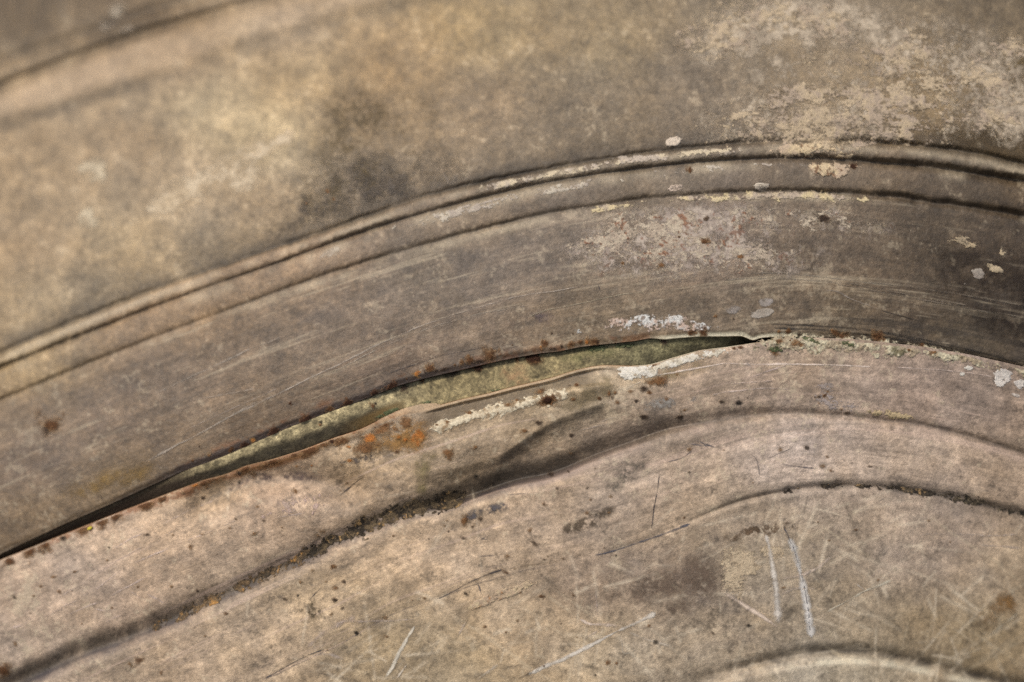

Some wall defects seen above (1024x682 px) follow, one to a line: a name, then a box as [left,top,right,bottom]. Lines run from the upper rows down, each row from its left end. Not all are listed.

corrosion [512,332,599,364]
corrosion [369,348,497,408]
corrosion [535,389,557,406]
corrosion [598,364,678,404]
corrosion [268,406,332,436]
corrosion [291,416,425,467]
crack [0,336,792,560]